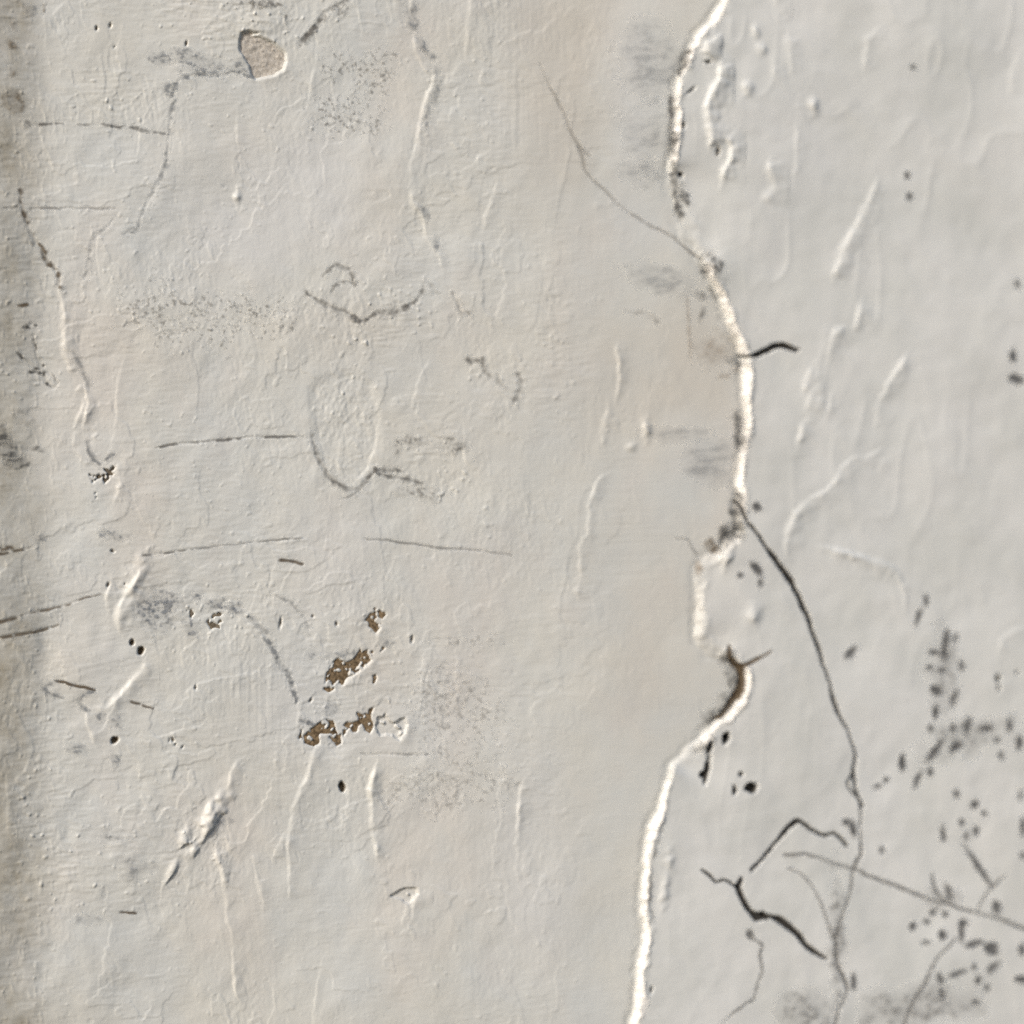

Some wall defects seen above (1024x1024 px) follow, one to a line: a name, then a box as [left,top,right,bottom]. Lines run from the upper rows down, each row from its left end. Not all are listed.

spalling [240,33,299,92]
peeling [670,0,727,177]
peeling [704,263,761,512]
crack [737,343,800,357]
spalling [738,563,762,586]
spalling [324,608,397,700]
peeling [699,666,753,783]
spalling [732,772,757,794]
crack [701,500,1024,1024]
peeling [630,778,671,1024]